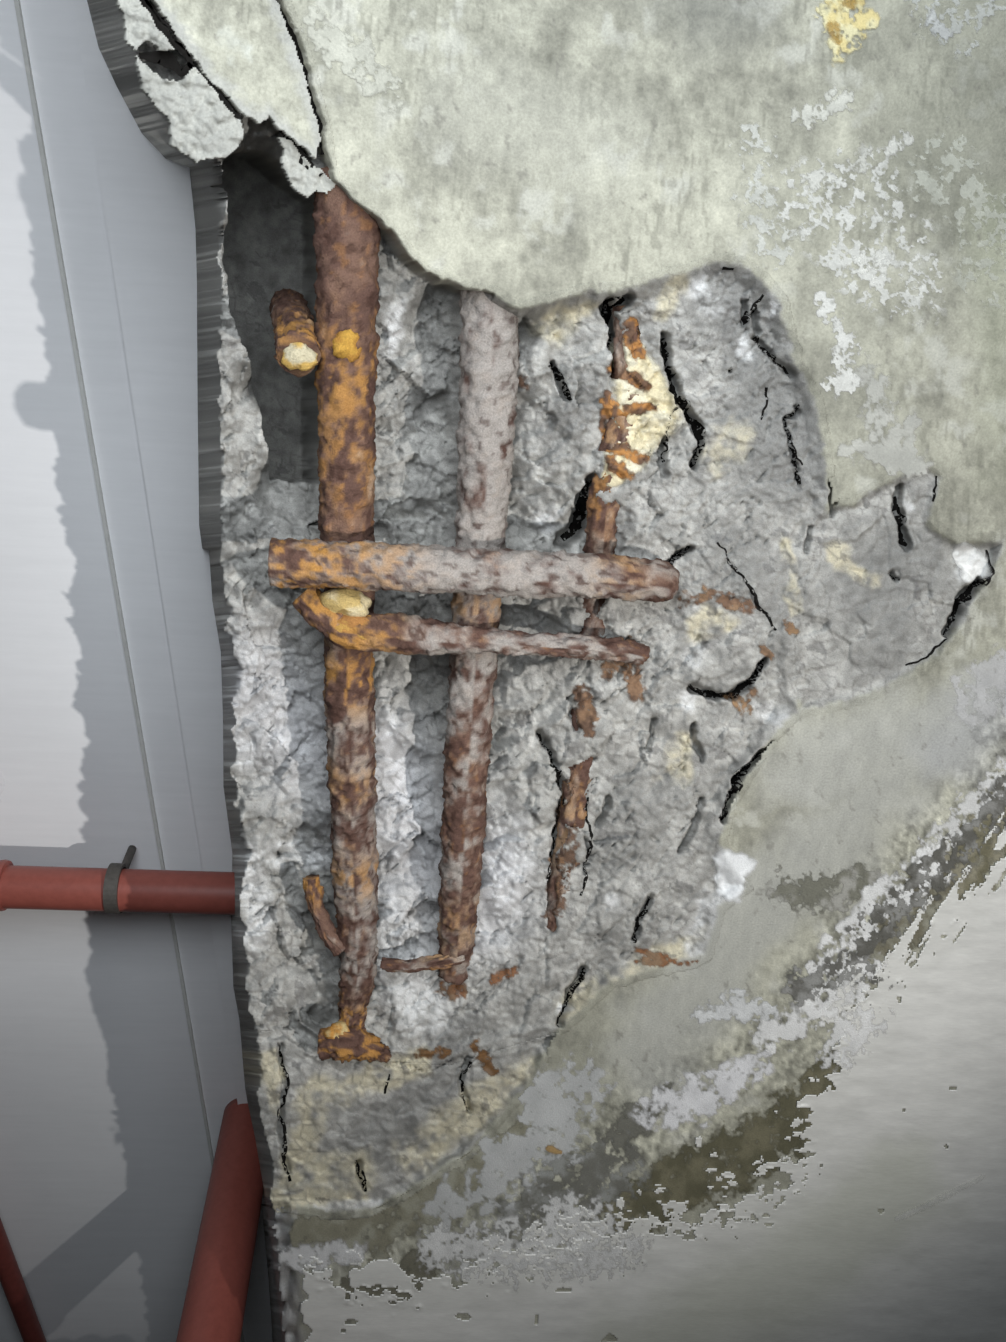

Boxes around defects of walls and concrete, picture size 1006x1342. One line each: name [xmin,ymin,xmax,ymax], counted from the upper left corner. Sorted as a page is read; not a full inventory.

crack [139,0,324,177]
corrosion [815,0,880,62]
corrosion [599,317,674,487]
crack [740,294,803,485]
spalling [87,0,556,1220]
corrosion [573,660,645,738]
spalling [278,0,1006,1065]
crack [668,542,777,699]
crack [905,550,995,666]
damp [951,649,1006,726]
damp [278,757,1006,1306]
peeling [298,812,1006,1342]